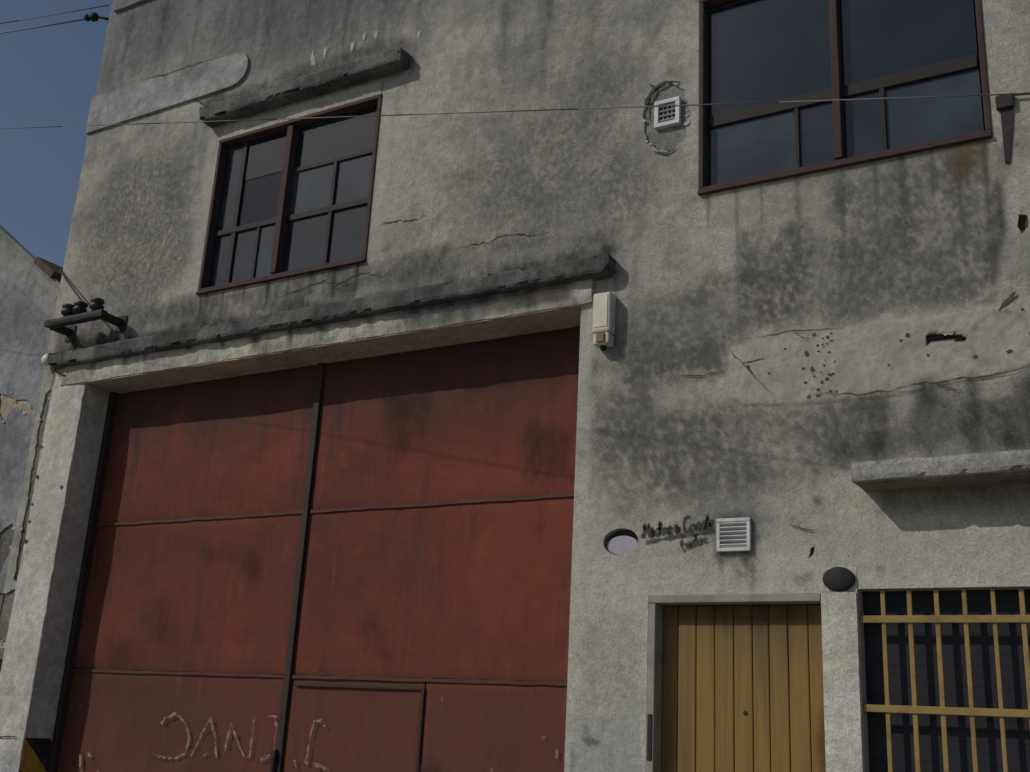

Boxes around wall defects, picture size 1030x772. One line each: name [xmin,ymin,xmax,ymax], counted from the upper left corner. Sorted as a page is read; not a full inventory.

spalling [642,80,690,151]
crack [460,233,545,248]
damp [741,149,1001,321]
crack [669,328,841,393]
spalling [726,292,1030,404]
crack [816,366,1030,395]
spalling [0,390,51,658]